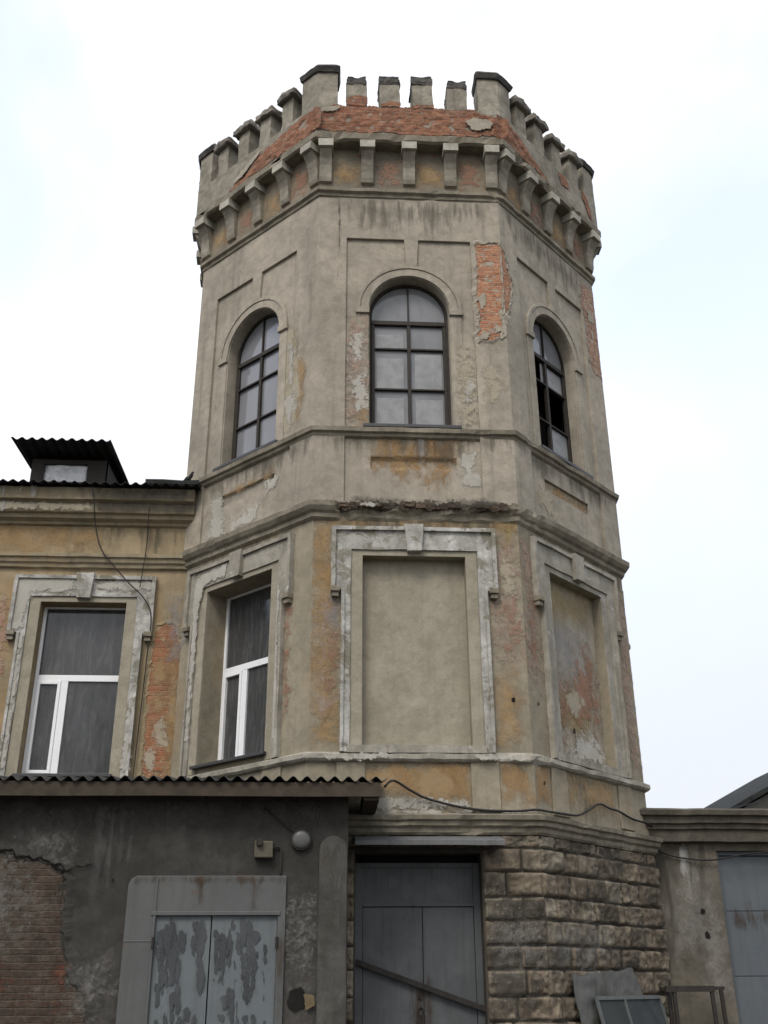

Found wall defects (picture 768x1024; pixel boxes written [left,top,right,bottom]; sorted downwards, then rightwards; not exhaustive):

flaking render [229,95,592,220]
peeling [345,316,369,423]
flaking render [470,239,514,345]
flaking render [580,279,603,382]
spalling [339,501,390,511]
spalling [404,501,461,511]
peeling [459,451,482,487]
peeling [94,580,152,593]
flaking render [119,564,227,778]
peeling [569,732,606,764]
crack [0,848,94,881]
flaking render [0,840,102,1024]